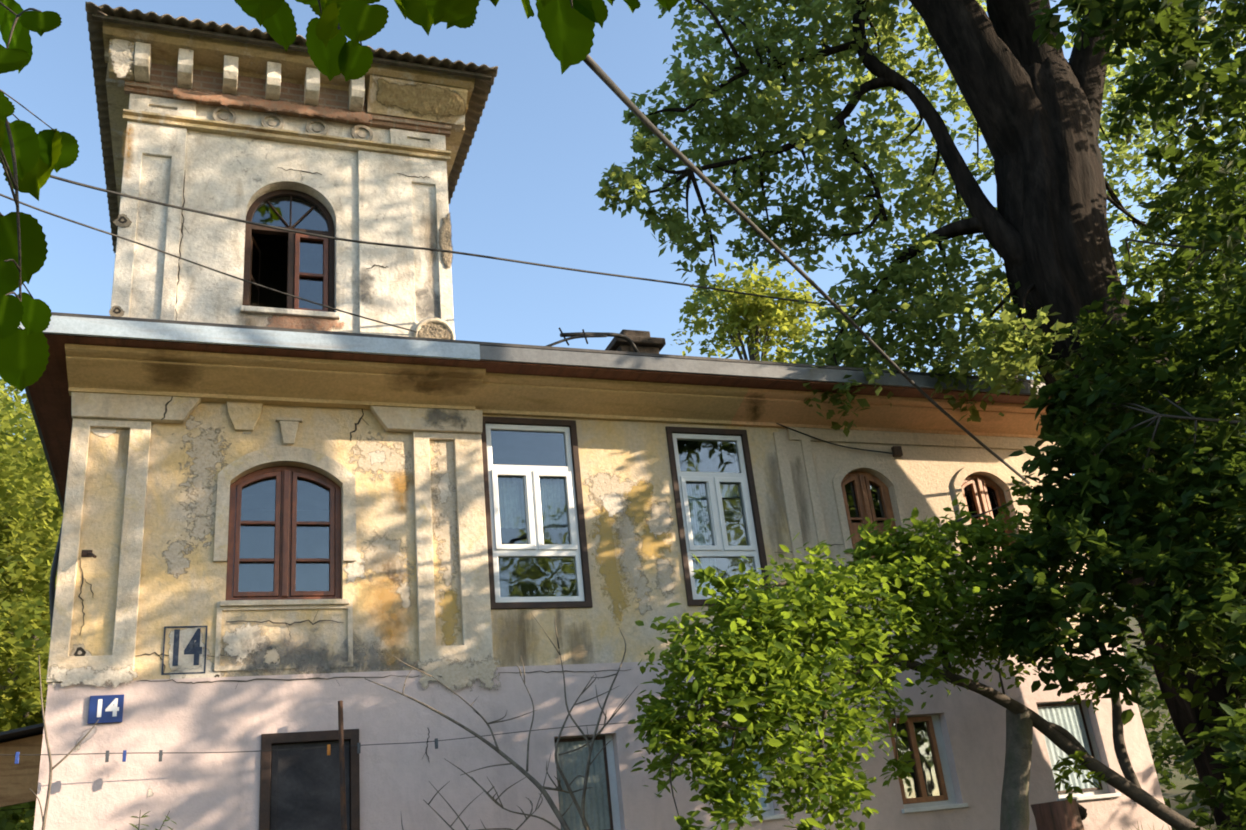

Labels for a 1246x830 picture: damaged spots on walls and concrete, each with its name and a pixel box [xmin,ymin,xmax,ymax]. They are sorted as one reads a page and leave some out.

crack [175,175,188,320]
crack [78,558,94,635]
spalling [47,643,138,688]
peeling [161,427,231,579]
peeling [342,529,415,608]
peeling [349,431,411,483]
peeling [417,440,501,692]
peeling [583,472,676,615]